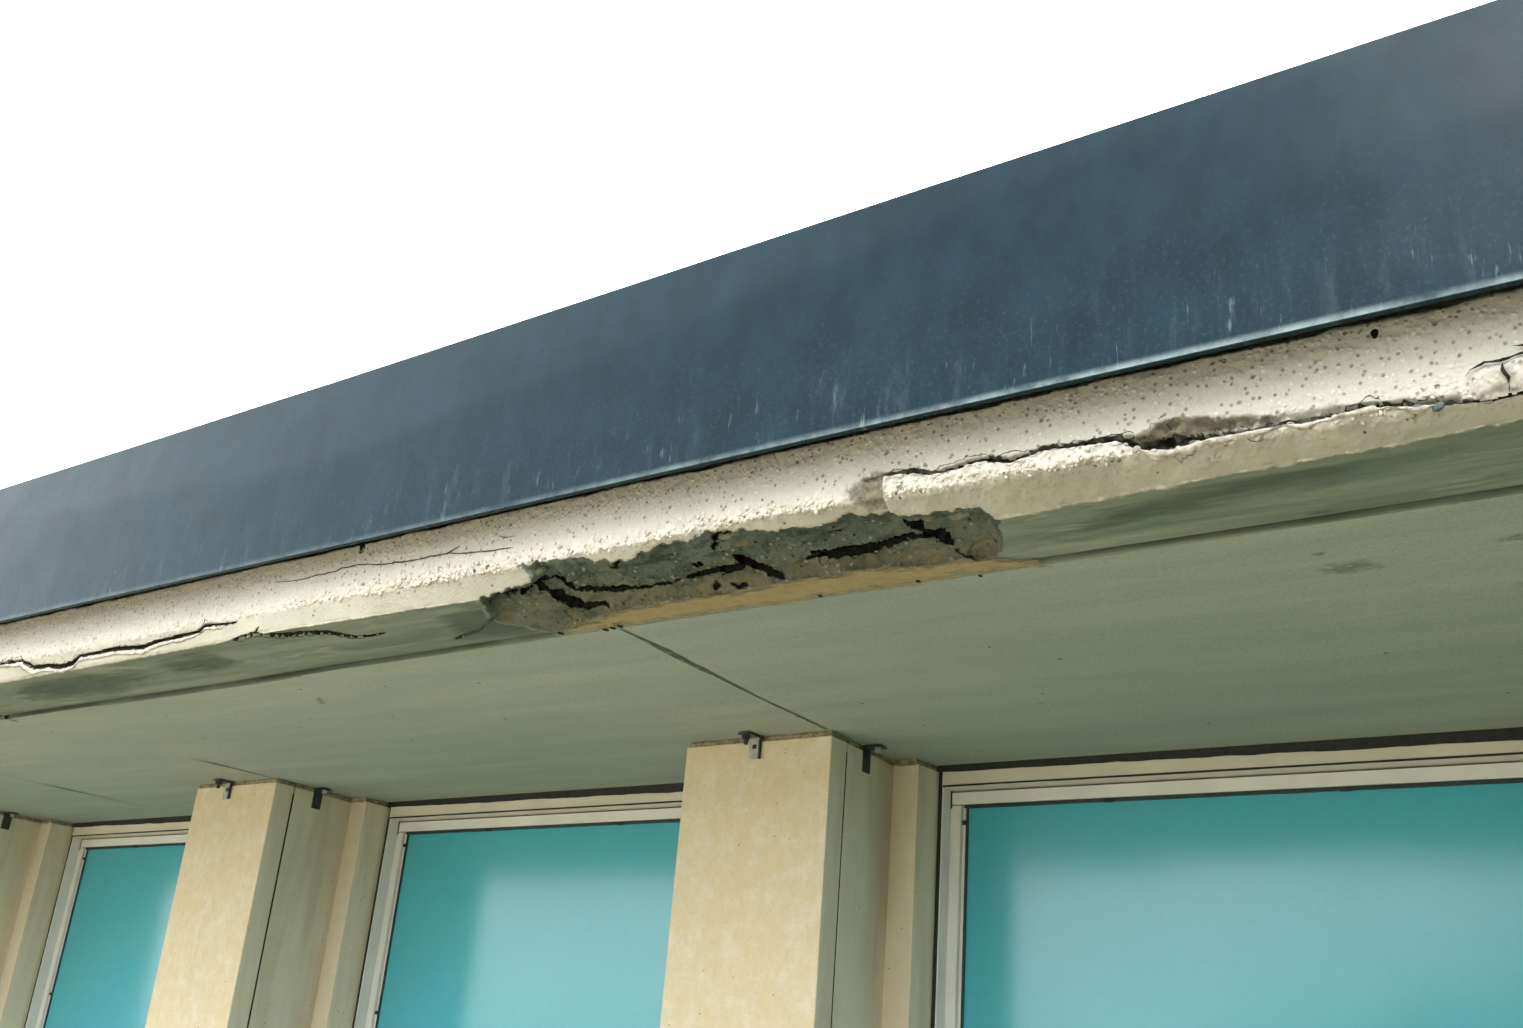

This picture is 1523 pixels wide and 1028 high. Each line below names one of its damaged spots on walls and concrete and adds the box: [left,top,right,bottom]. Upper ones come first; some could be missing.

crack [864,391,1523,482]
peeling [1335,387,1469,425]
spalling [282,446,1125,633]
crack [0,619,384,675]